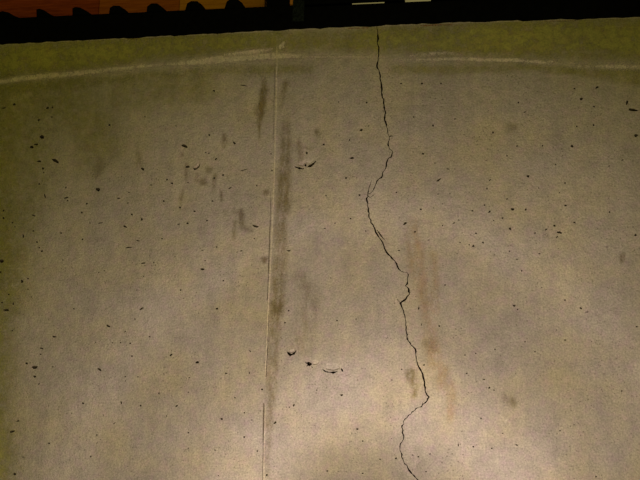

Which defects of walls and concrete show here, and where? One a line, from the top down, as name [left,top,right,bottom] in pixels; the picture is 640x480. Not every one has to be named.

crack [366,29,430,480]